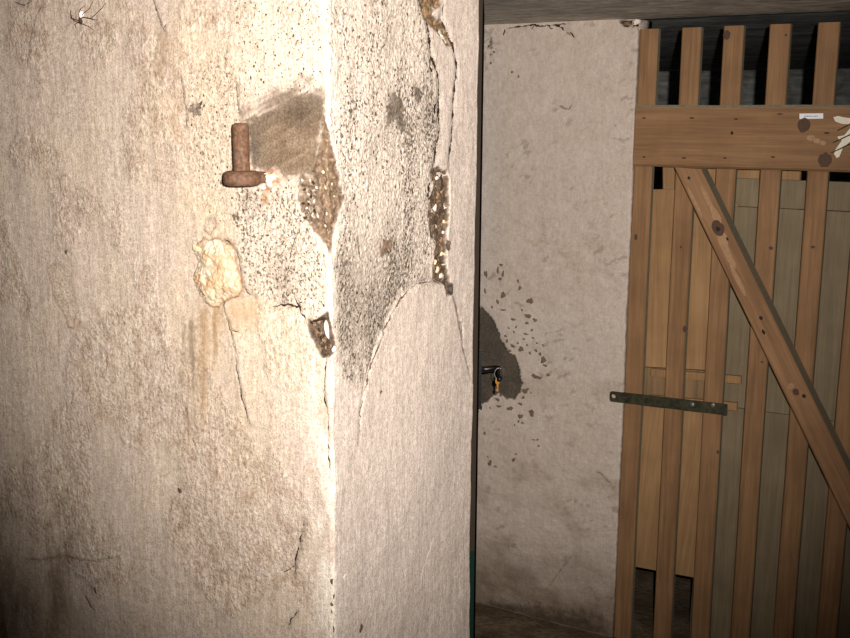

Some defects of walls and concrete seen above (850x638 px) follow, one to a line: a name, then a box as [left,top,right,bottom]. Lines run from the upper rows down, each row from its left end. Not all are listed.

spalling [419,0,450,46]
peeling [247,89,343,251]
peeling [380,238,393,257]
peeling [386,86,421,134]
spalling [427,167,451,295]
crack [222,239,251,421]
spalling [308,312,337,358]
crack [359,281,433,432]